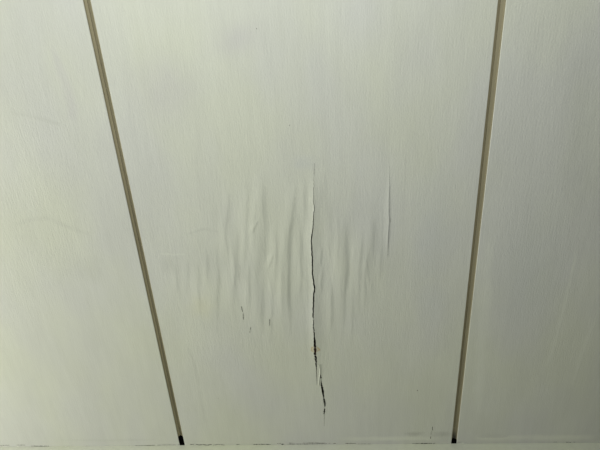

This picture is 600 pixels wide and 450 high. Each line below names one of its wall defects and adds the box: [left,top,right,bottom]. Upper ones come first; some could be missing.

crack [311,187,326,414]